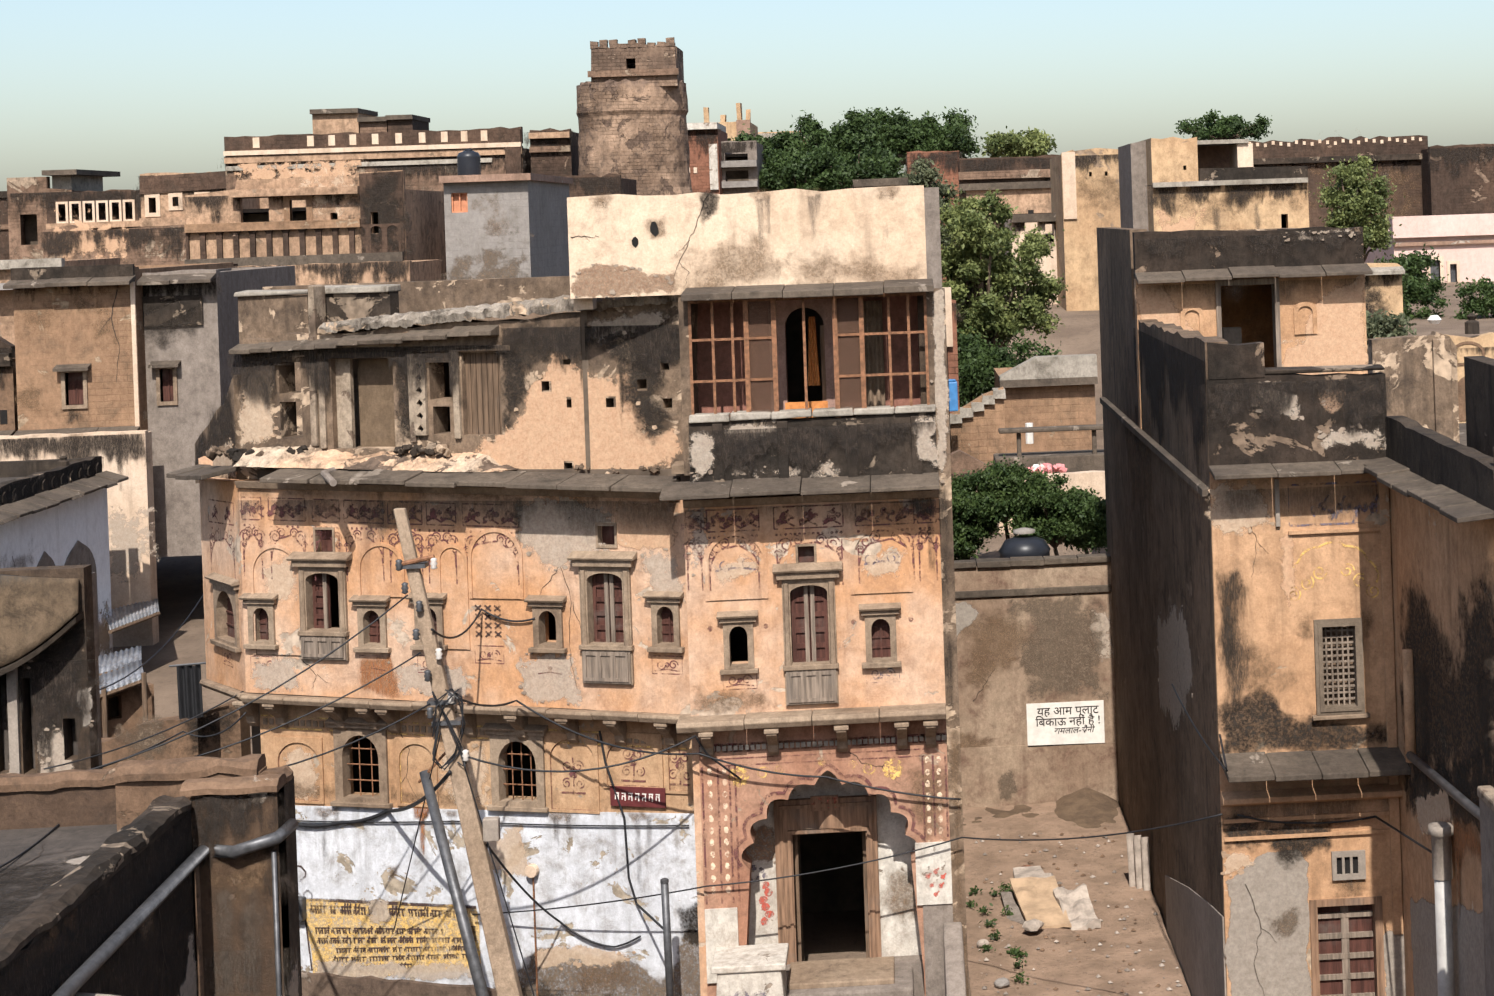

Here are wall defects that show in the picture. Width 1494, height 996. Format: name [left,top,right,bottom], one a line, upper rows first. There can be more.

leakage [0,175,186,259]
leakage [175,156,458,284]
crack [674,206,703,287]
flaking render [1265,275,1368,382]
leakage [0,411,148,506]
leakage [195,318,680,465]
flaking render [475,353,715,479]
flaking render [730,420,776,433]
flaking render [1281,395,1304,420]
flaking render [1317,392,1386,449]
leakage [1217,572,1494,831]
crack [1245,884,1276,993]